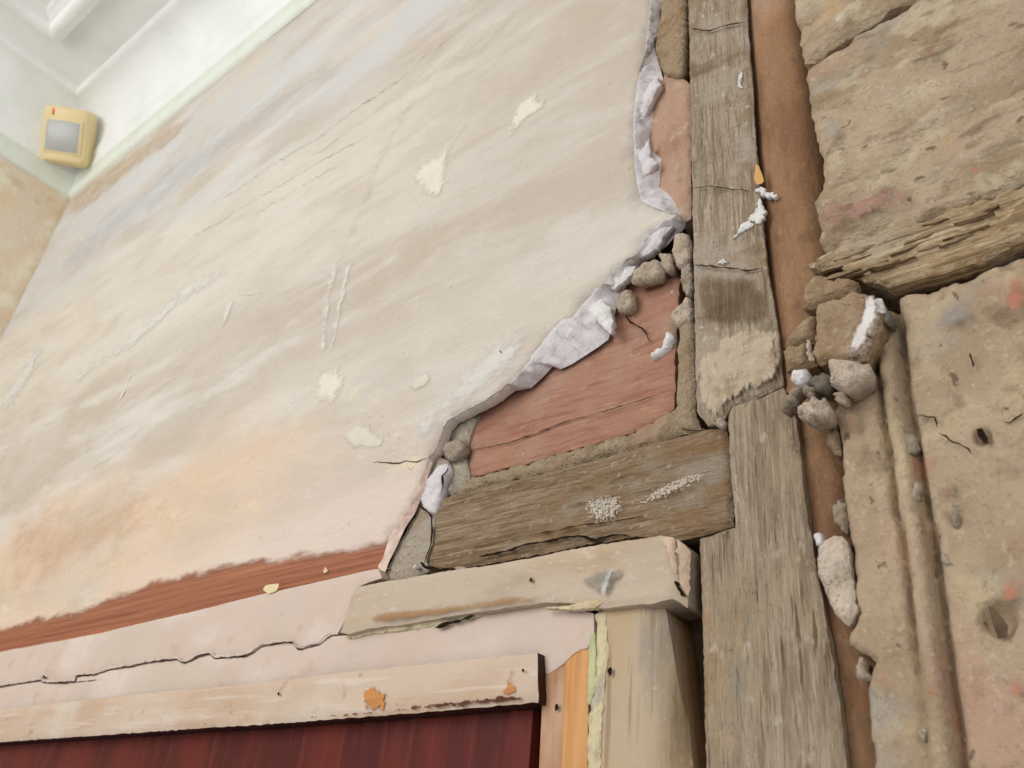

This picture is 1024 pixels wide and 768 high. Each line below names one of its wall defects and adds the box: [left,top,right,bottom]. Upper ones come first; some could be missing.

flaking render [0,0,686,652]
crack [372,458,646,572]
peeling [662,537,692,597]
crack [0,633,332,687]
peeling [363,688,390,711]